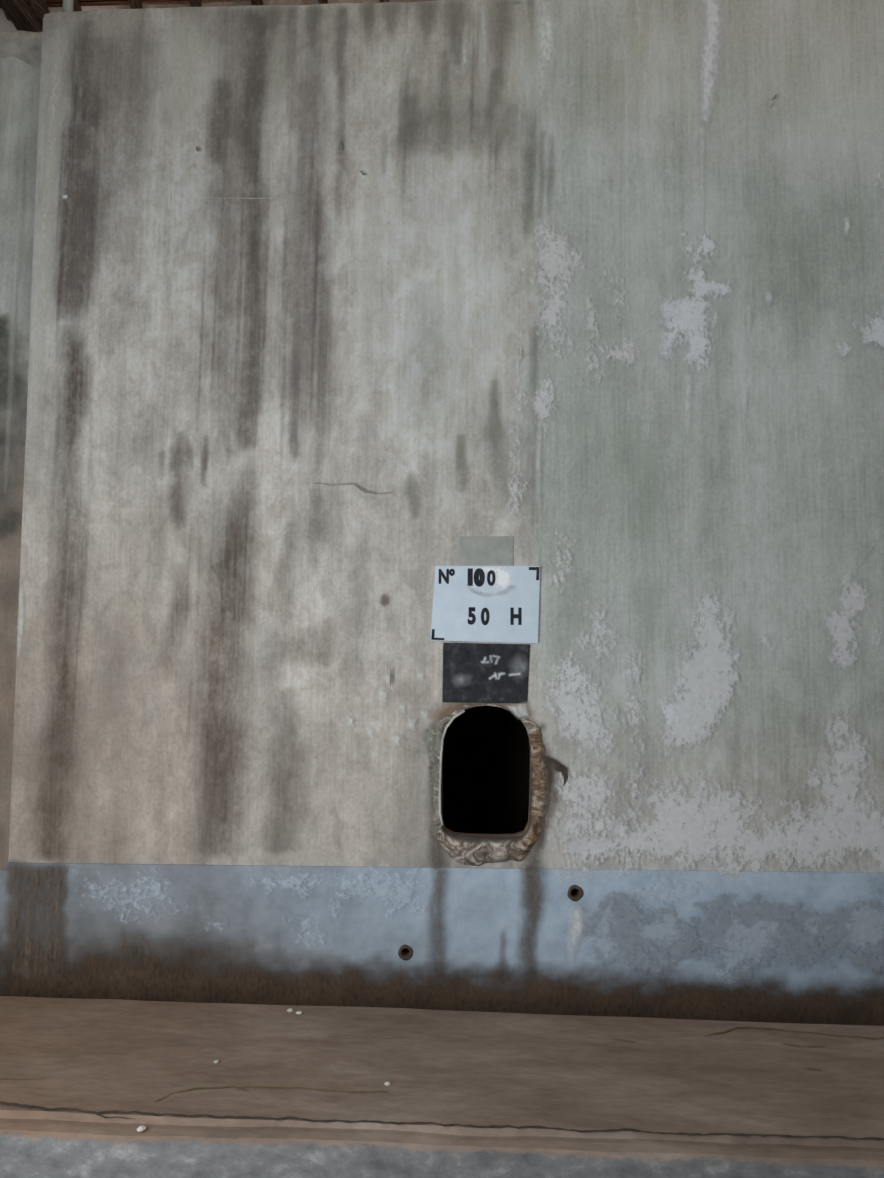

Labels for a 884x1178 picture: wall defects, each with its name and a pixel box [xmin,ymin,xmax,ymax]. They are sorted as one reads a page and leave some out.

leakage [39,51,94,313]
leakage [529,0,556,99]
leakage [700,0,723,234]
leakage [66,342,83,448]
peeling [506,331,557,516]
peeling [522,219,638,380]
peeling [659,232,732,373]
peeling [838,308,884,356]
peeling [409,575,884,897]
leakage [0,647,884,1026]
peeling [716,920,778,984]
crack [0,1078,884,1140]